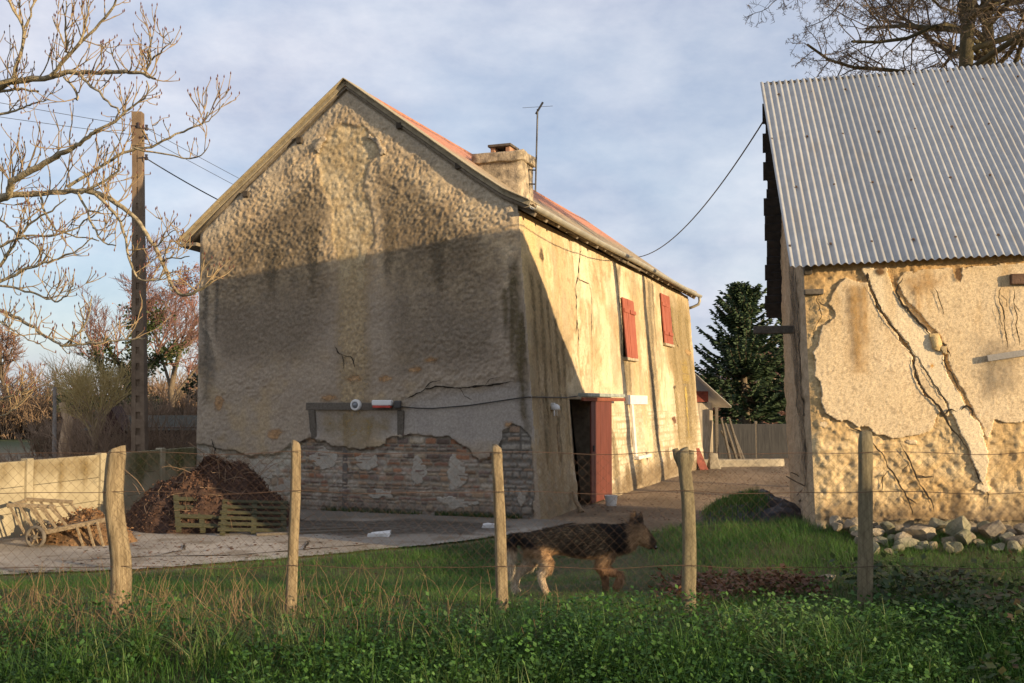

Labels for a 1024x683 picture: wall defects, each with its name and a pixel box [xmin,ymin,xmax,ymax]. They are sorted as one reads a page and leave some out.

crack [576,252,593,347]
crack [997,287,1020,347]
crack [408,377,514,400]
flaking render [812,263,1024,494]
crack [866,273,989,505]
flaking render [196,423,534,519]